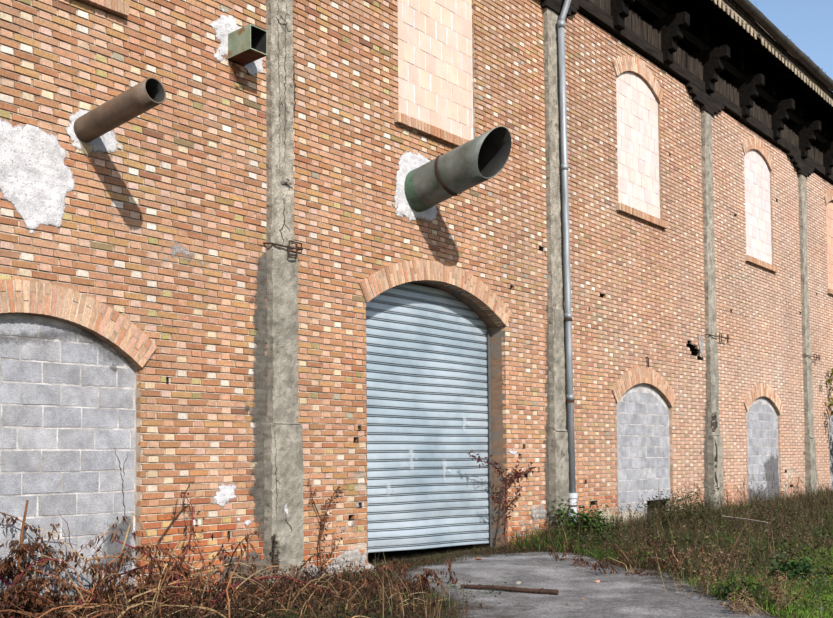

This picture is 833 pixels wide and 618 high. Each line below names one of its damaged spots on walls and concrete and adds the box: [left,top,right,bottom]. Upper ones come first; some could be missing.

crack [276,1,296,189]
spalling [686,340,706,361]
crack [115,450,136,542]